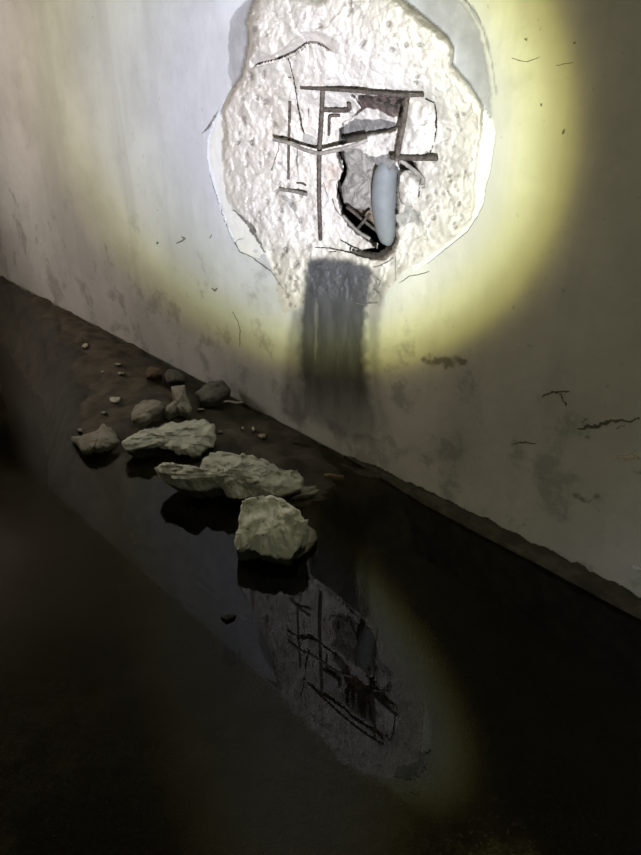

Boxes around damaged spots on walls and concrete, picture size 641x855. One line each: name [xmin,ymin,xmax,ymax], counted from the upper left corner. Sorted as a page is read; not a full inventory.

corrosion [355,94,403,118]
spalling [202,0,496,318]
damp [300,259,370,408]
crack [542,391,570,406]
crack [577,417,640,430]